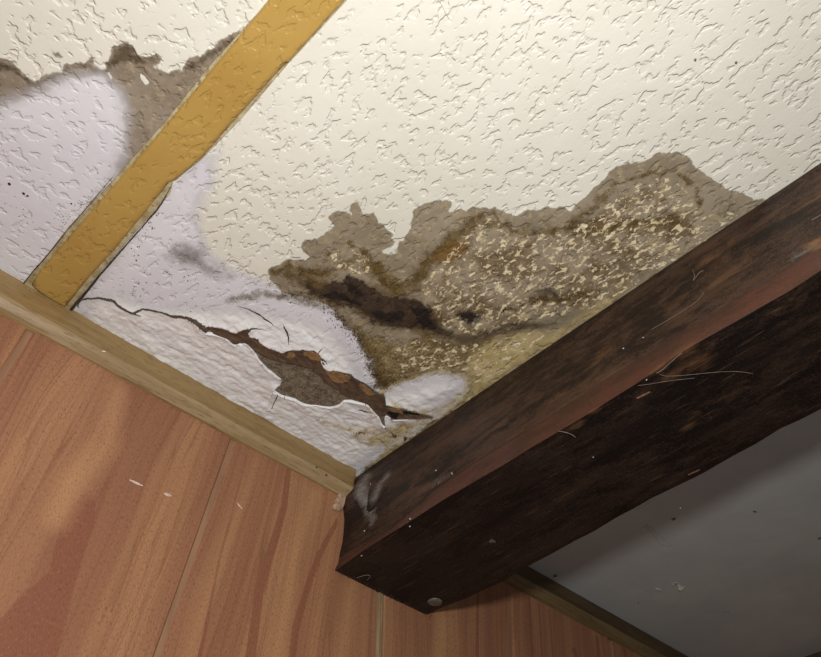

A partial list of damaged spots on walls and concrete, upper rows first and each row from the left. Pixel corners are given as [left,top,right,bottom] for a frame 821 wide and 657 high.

damp [0,31,240,174]
crack [77,297,209,333]
crack [237,306,289,344]
damp [230,152,766,472]
flaking render [206,327,433,426]